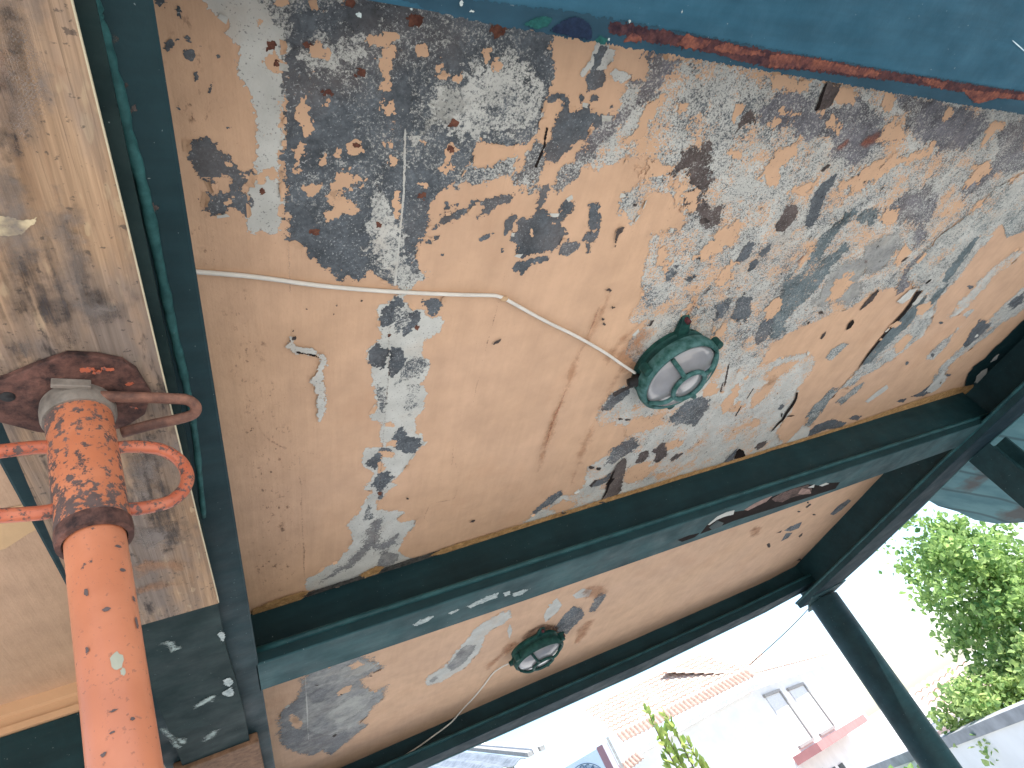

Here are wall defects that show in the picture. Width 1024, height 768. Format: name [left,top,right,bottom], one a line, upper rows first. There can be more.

peeling [163,35,199,82]
rust [404,0,1024,115]
peeling [182,0,1024,591]
peeling [424,610,513,685]
peeling [448,589,527,614]
peeling [544,589,607,634]
peeling [275,655,390,756]